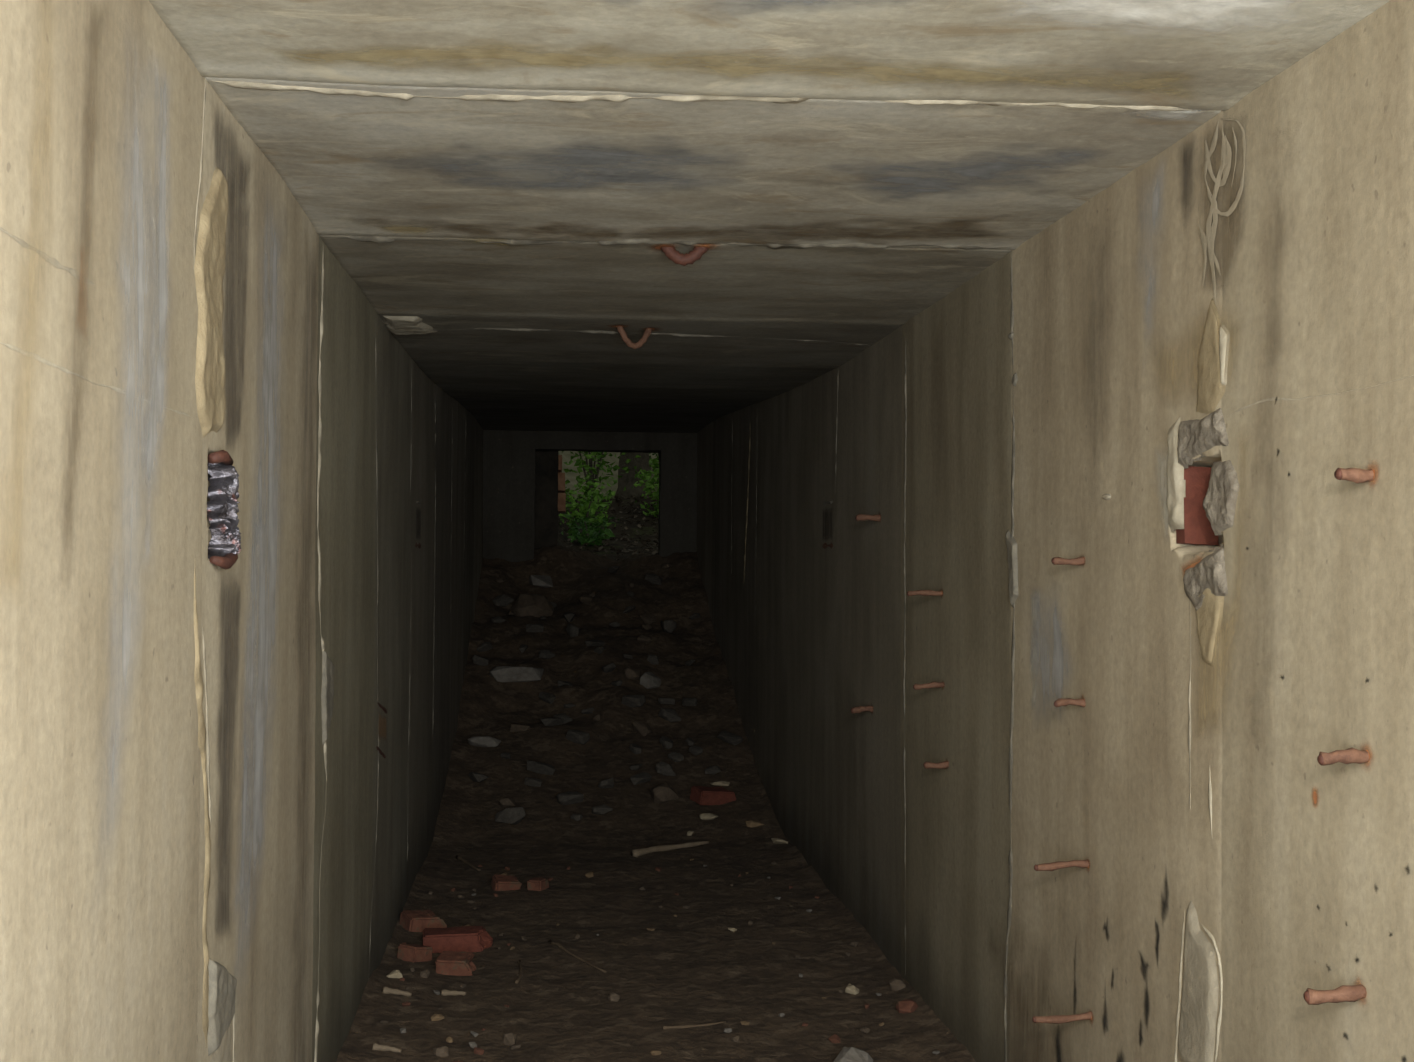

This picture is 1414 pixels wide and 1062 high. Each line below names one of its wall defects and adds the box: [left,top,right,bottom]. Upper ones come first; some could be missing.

crack [0,227,95,285]
corrosion [1334,467,1377,483]
spalling [1161,298,1239,722]
corrosion [1317,747,1371,766]
corrosion [1303,982,1367,1005]
corrosion [1032,1011,1093,1024]